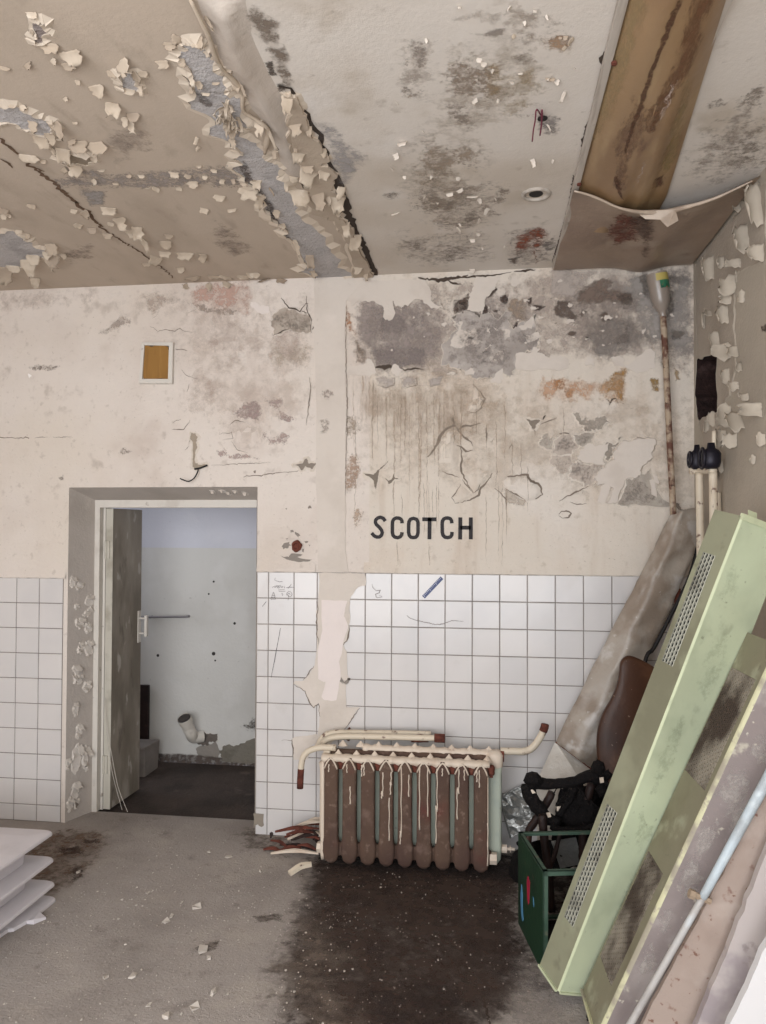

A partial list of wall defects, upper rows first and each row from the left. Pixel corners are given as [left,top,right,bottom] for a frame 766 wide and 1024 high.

water stain [452,64,503,95]
water stain [707,88,761,166]
crack [0,138,173,278]
peeling [254,91,374,281]
water stain [405,147,487,259]
flaking render [345,276,569,388]
corrosion [543,370,626,400]
flaking render [695,181,766,473]
water stain [345,456,359,488]
crack [427,384,588,518]
peeling [524,412,686,512]
flaking render [196,731,255,765]